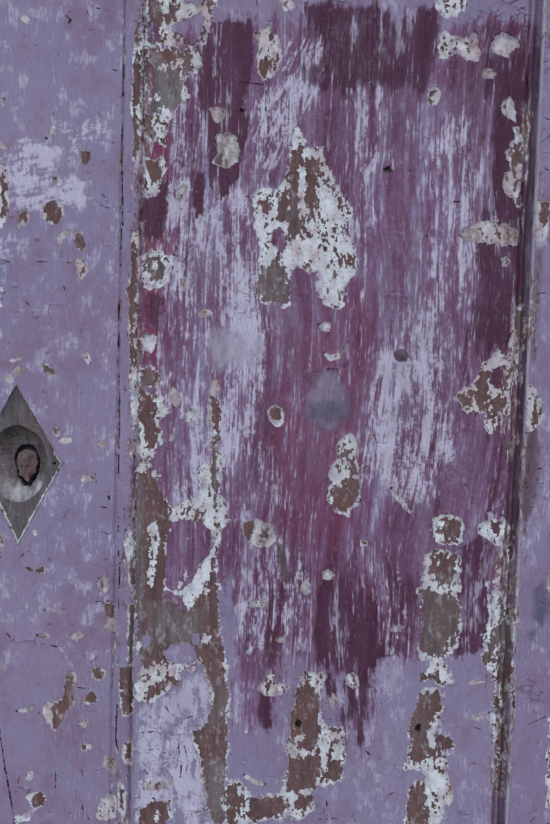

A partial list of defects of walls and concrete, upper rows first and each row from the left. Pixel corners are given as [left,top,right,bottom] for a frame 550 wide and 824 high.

peeling [129,0,218,200]
peeling [208,106,240,169]
peeling [251,125,359,310]
peeling [437,29,520,62]
peeling [501,96,526,208]
peeling [452,303,545,434]
peeling [118,228,348,824]
peeling [327,432,362,517]
peeling [478,510,516,563]
peeling [403,514,465,824]
peeling [468,578,517,803]
peeling [96,740,174,824]